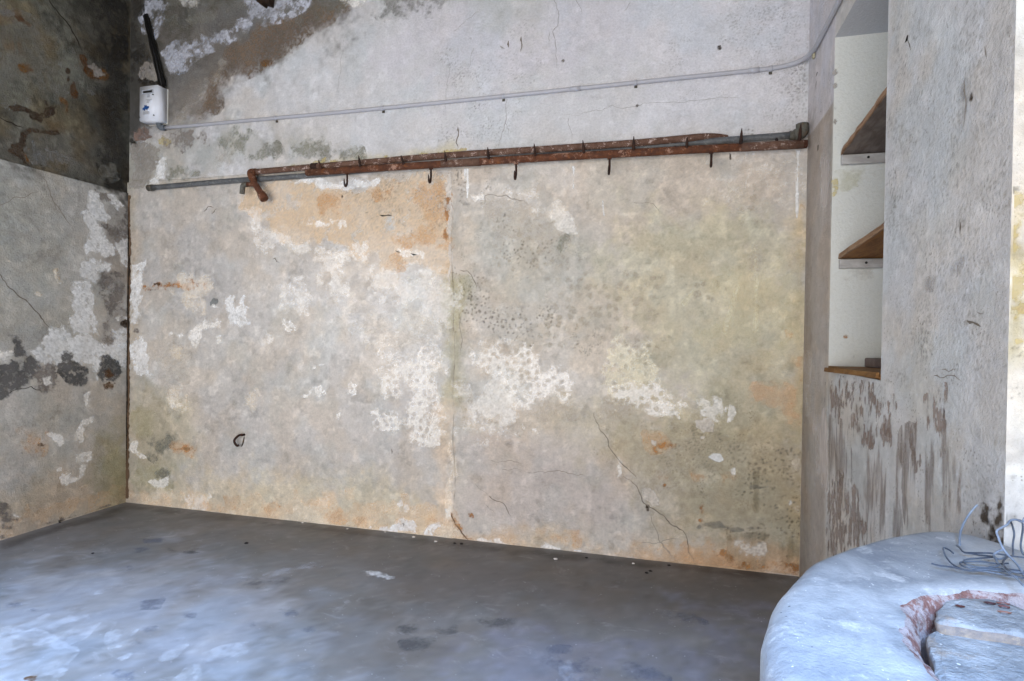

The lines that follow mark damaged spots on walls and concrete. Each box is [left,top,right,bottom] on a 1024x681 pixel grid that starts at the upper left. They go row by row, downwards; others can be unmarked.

leakage [240,172,477,287]
crack [0,274,49,327]
peeling [32,190,128,379]
rust [143,279,204,291]
leakage [34,363,57,393]
leakage [459,319,572,419]
efflorescence [606,341,736,422]
crack [594,417,694,561]
mould [973,500,1003,545]